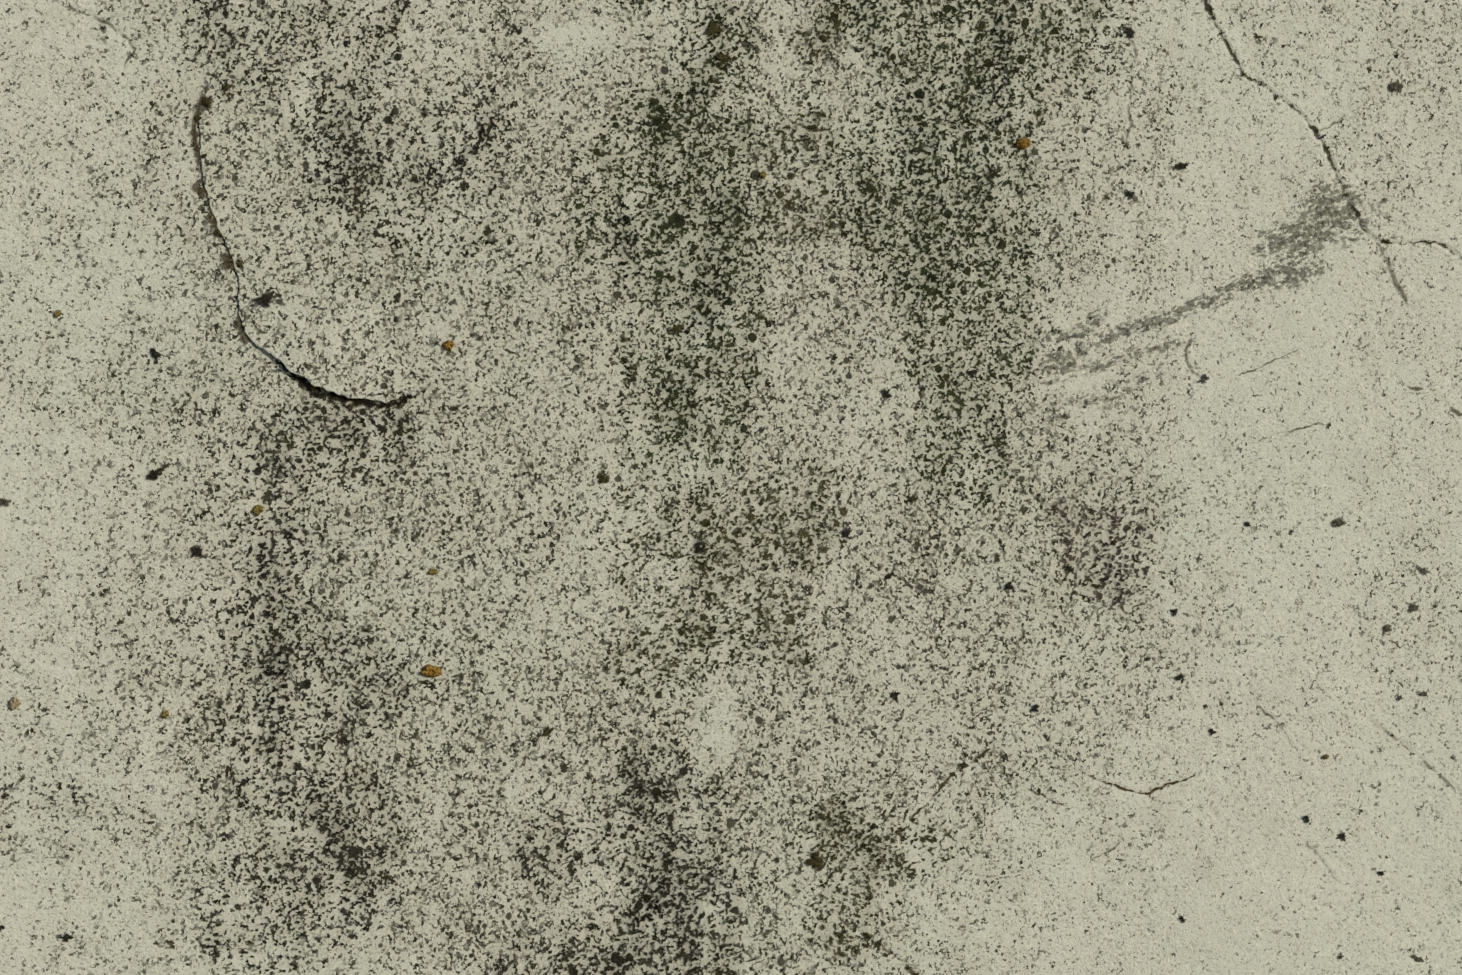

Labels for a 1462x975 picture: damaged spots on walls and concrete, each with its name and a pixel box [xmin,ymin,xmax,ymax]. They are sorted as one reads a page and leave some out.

mould [183,0,517,265]
crack [1205,0,1454,302]
leakage [253,294,273,308]
mould [570,0,1135,698]
crack [1181,338,1202,422]
crack [1239,349,1298,376]
leakage [147,468,162,480]
leakage [191,545,204,558]
mould [1045,501,1152,606]
mould [204,396,425,974]
mould [490,740,746,975]
mould [787,794,958,956]